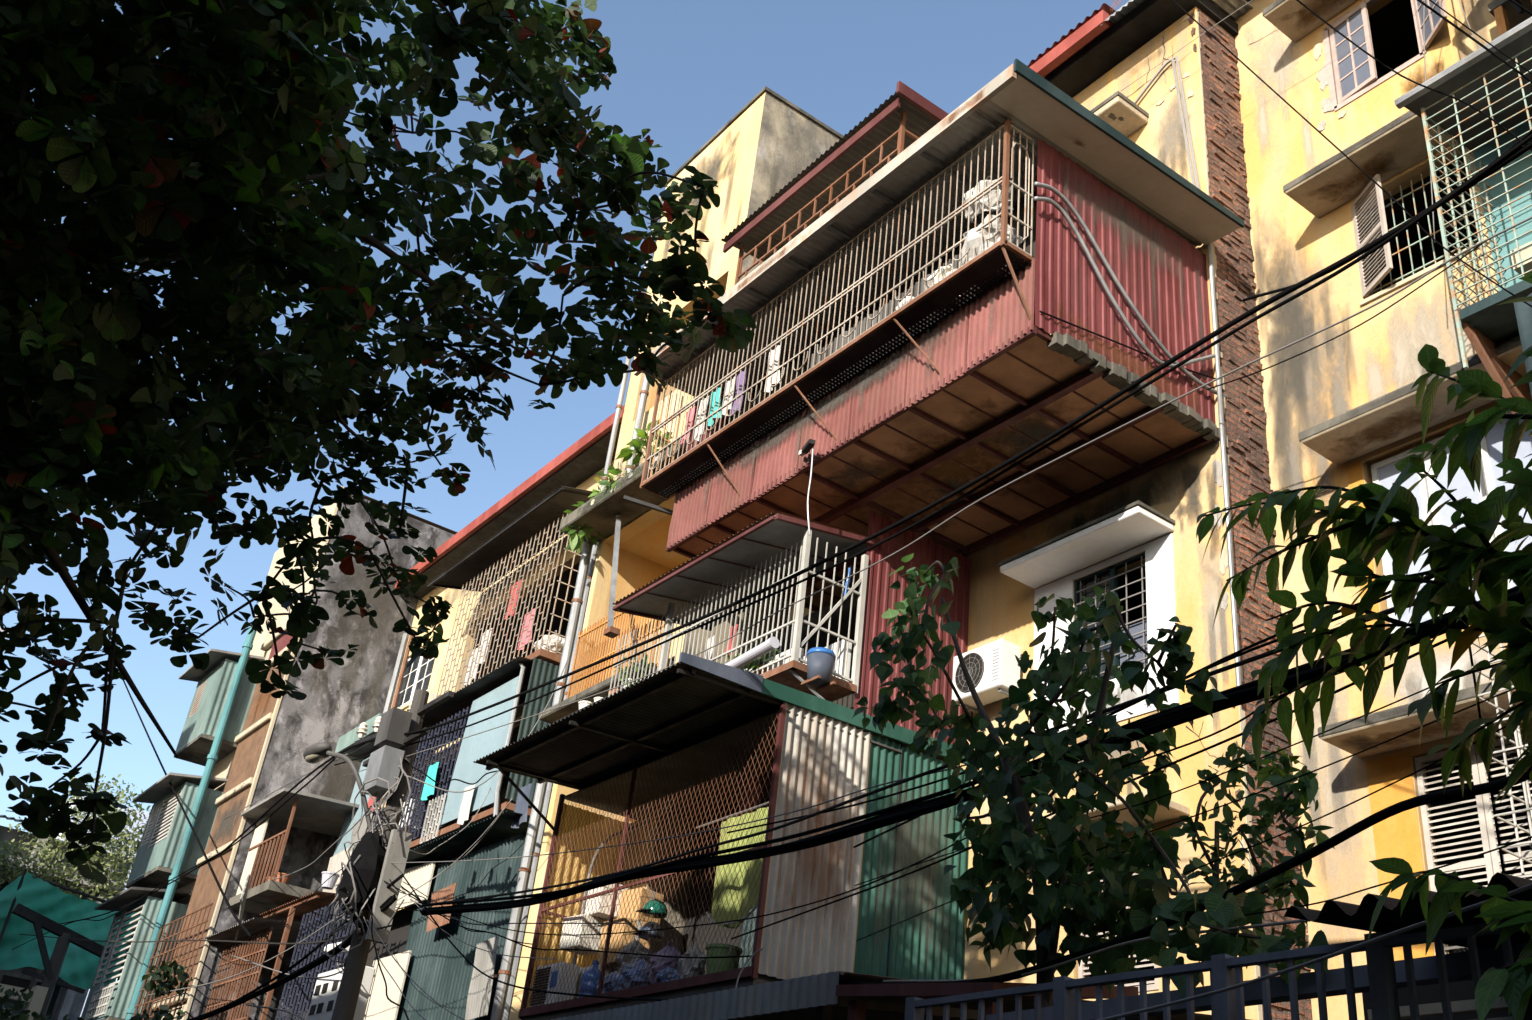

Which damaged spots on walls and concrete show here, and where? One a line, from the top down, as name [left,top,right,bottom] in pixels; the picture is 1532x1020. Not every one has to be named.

peeling [1314,42,1347,132]
water stain [1263,261,1473,513]
water stain [315,546,412,654]
water stain [1062,469,1228,689]
water stain [269,694,361,802]